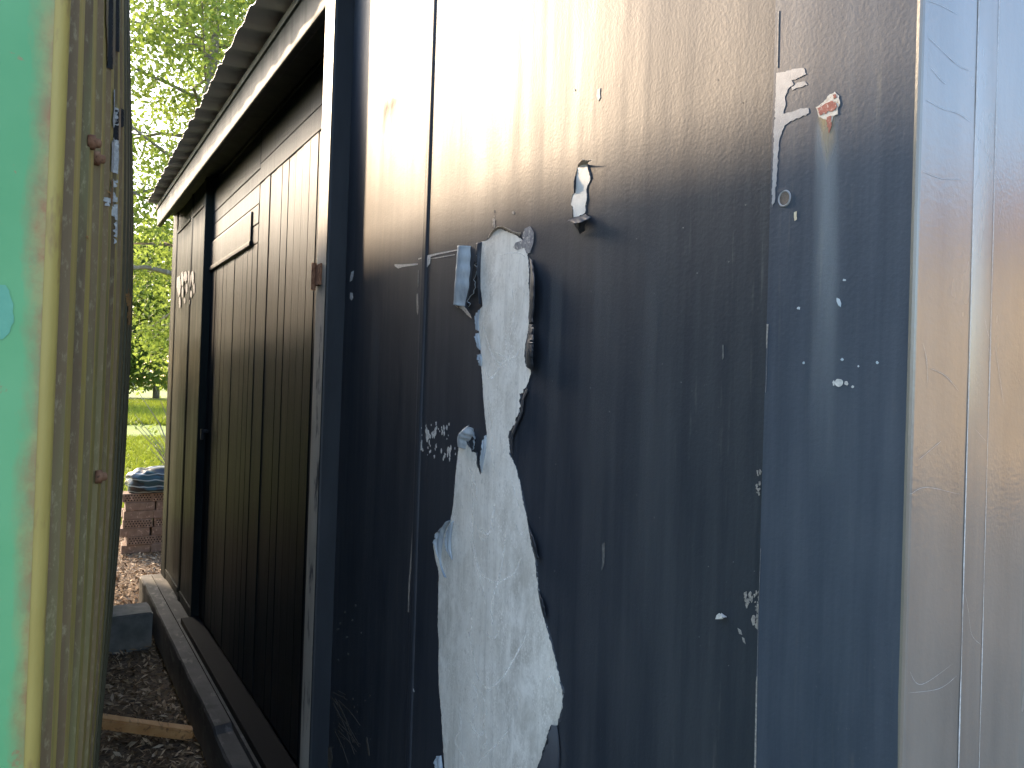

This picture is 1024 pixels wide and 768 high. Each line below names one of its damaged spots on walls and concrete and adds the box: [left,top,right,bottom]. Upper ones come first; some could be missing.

peeling [772,68,809,205]
corrosion [816,92,840,146]
peeling [567,159,592,233]
peeling [421,211,564,768]
peeling [738,590,759,643]